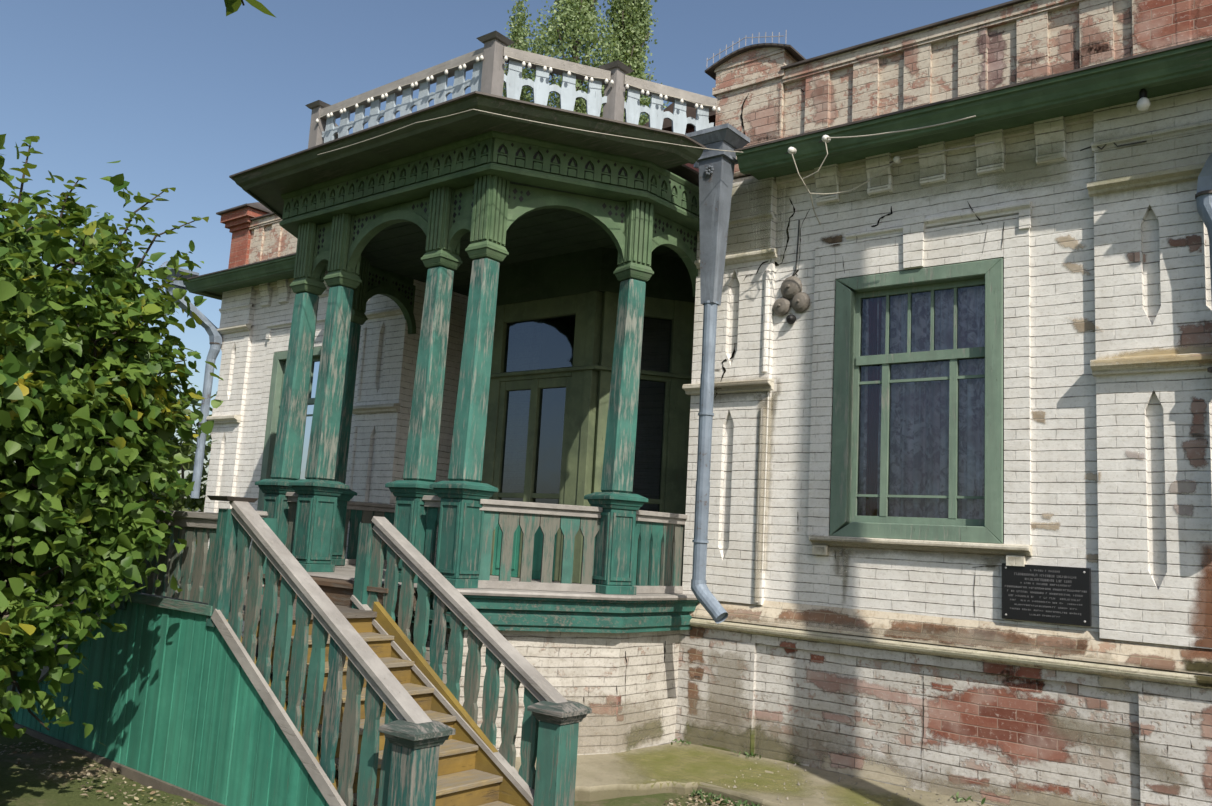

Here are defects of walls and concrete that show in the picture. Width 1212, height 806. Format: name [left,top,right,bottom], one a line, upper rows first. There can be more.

flaking render [976,0,1212,90]
crack [744,198,810,280]
crack [843,206,893,273]
flaking render [1178,320,1212,363]
flaking render [1169,397,1208,516]
flaking render [589,695,624,721]
flaking render [776,609,1088,764]
flaking render [1085,640,1212,709]
flaking render [821,752,910,787]
flaking render [930,774,1108,806]
flaking render [1144,784,1180,806]
flaking render [1201,706,1212,796]